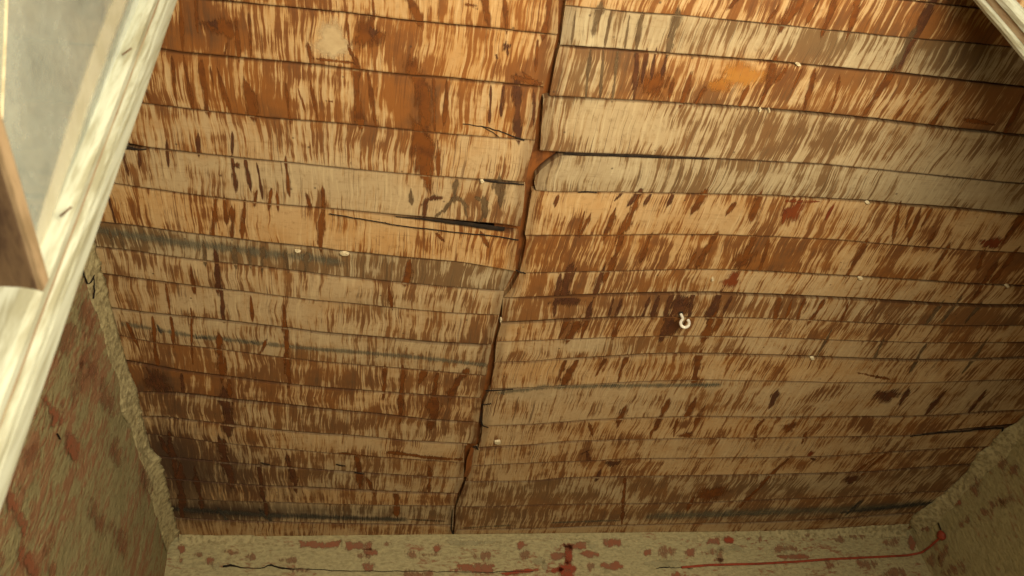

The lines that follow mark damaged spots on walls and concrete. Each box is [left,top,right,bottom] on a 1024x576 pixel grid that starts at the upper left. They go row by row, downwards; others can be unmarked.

crack [465,124,524,141]
crack [329,213,519,241]
leakage [97,228,339,274]
crack [480,389,513,428]
crack [910,427,1004,437]
spalling [177,544,256,565]
spalling [279,540,388,572]
spalling [455,552,495,574]
spalling [581,538,623,570]
spalling [644,536,762,562]